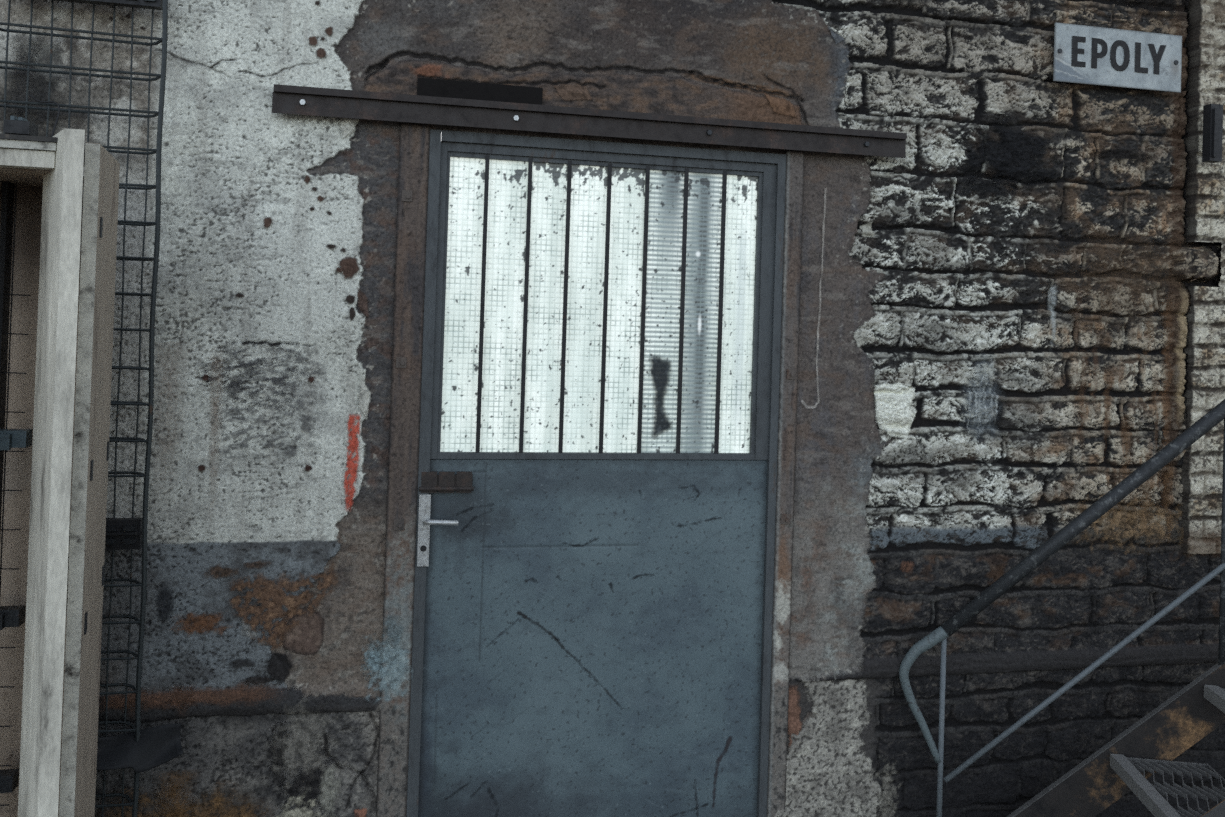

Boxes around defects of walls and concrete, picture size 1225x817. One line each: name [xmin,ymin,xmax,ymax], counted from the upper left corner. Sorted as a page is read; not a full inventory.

spalling [308,0,851,128]
spalling [204,118,897,817]